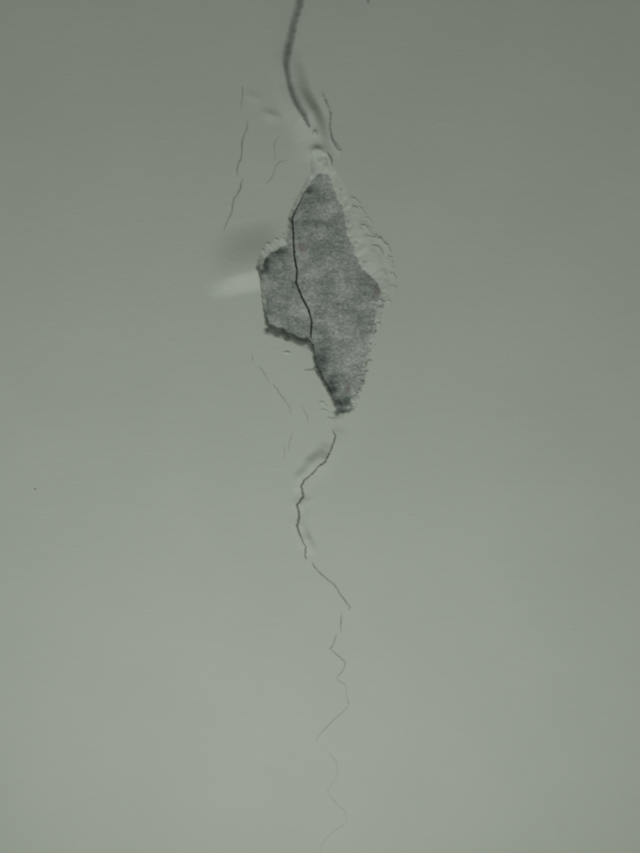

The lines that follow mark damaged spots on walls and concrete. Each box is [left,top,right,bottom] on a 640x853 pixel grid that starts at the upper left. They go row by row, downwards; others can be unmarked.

crack [224,86,248,230]
crack [281,0,341,166]
flaking render [256,150,393,419]
crack [295,430,351,852]